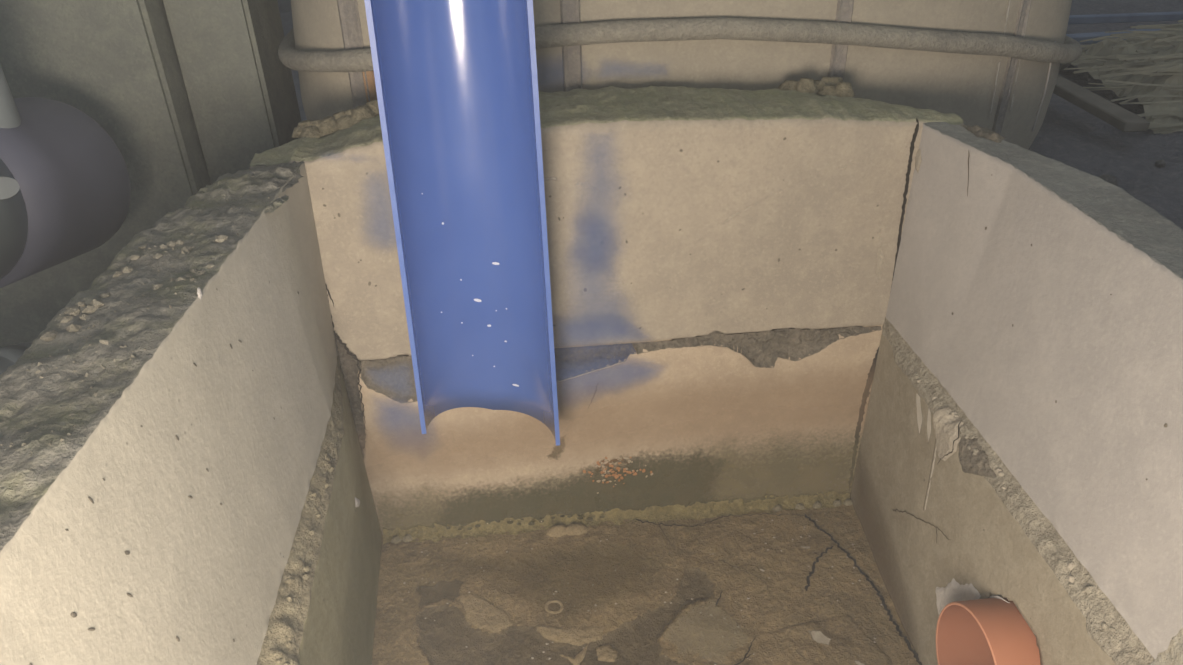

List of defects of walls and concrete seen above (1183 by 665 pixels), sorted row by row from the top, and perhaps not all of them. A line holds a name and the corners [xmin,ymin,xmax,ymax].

crack [890,118,919,293]
spalling [554,326,882,382]
leakage [548,437,564,458]
peeling [933,406,997,479]
leakage [441,454,715,527]
crack [632,513,922,665]